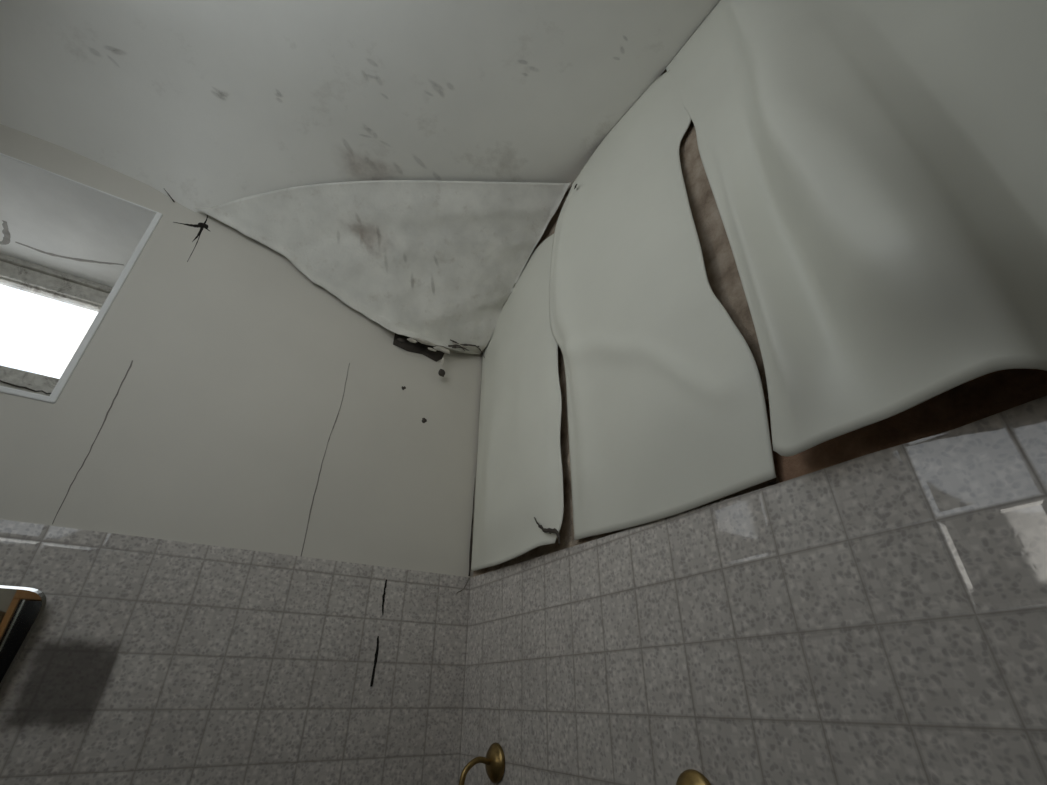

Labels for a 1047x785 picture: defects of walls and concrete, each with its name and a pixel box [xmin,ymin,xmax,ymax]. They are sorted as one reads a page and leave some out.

flaking render [683,126,764,369]
flaking render [765,369,1047,483]
crack [370,579,387,687]